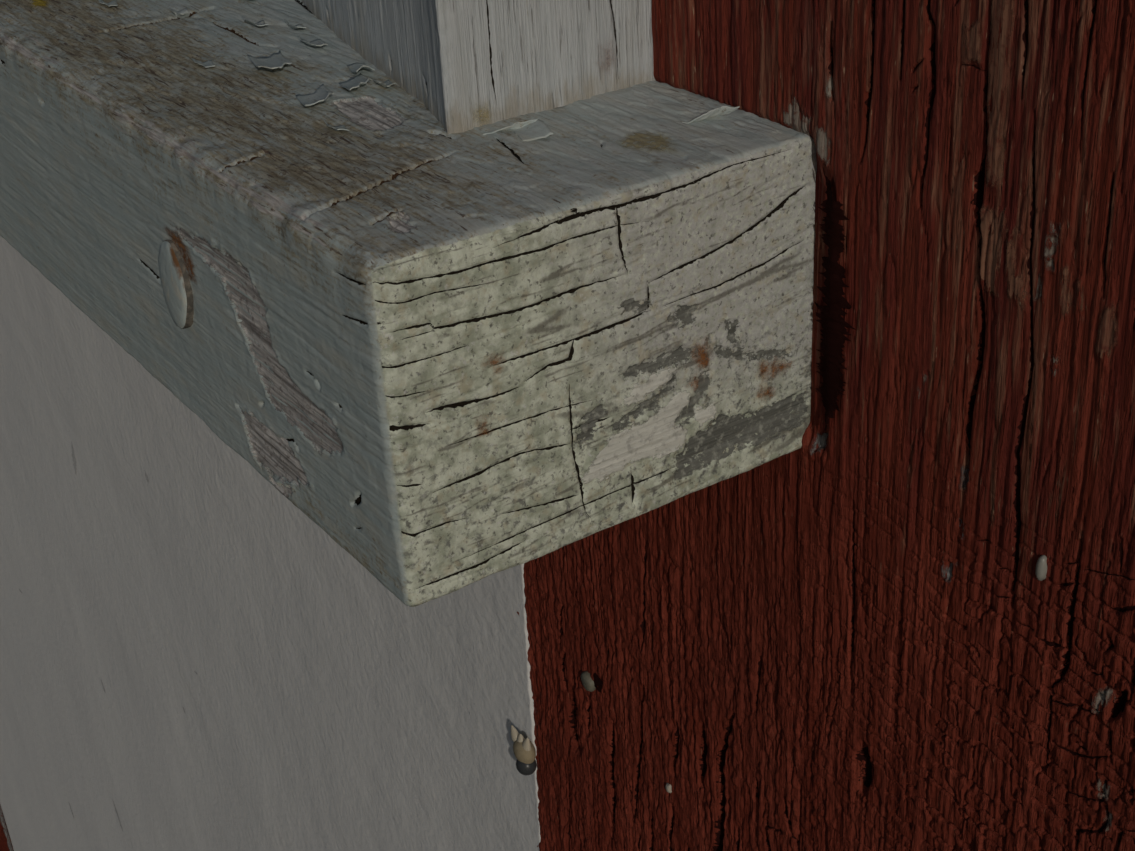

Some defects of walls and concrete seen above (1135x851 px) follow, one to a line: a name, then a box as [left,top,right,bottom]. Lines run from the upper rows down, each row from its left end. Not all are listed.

peeling [295,84,408,131]
crack [496,138,524,164]
corrosion [167,229,194,280]
peeling [175,227,343,455]
crack [332,149,806,589]
peeling [241,410,309,500]
crack [977,0,1135,844]